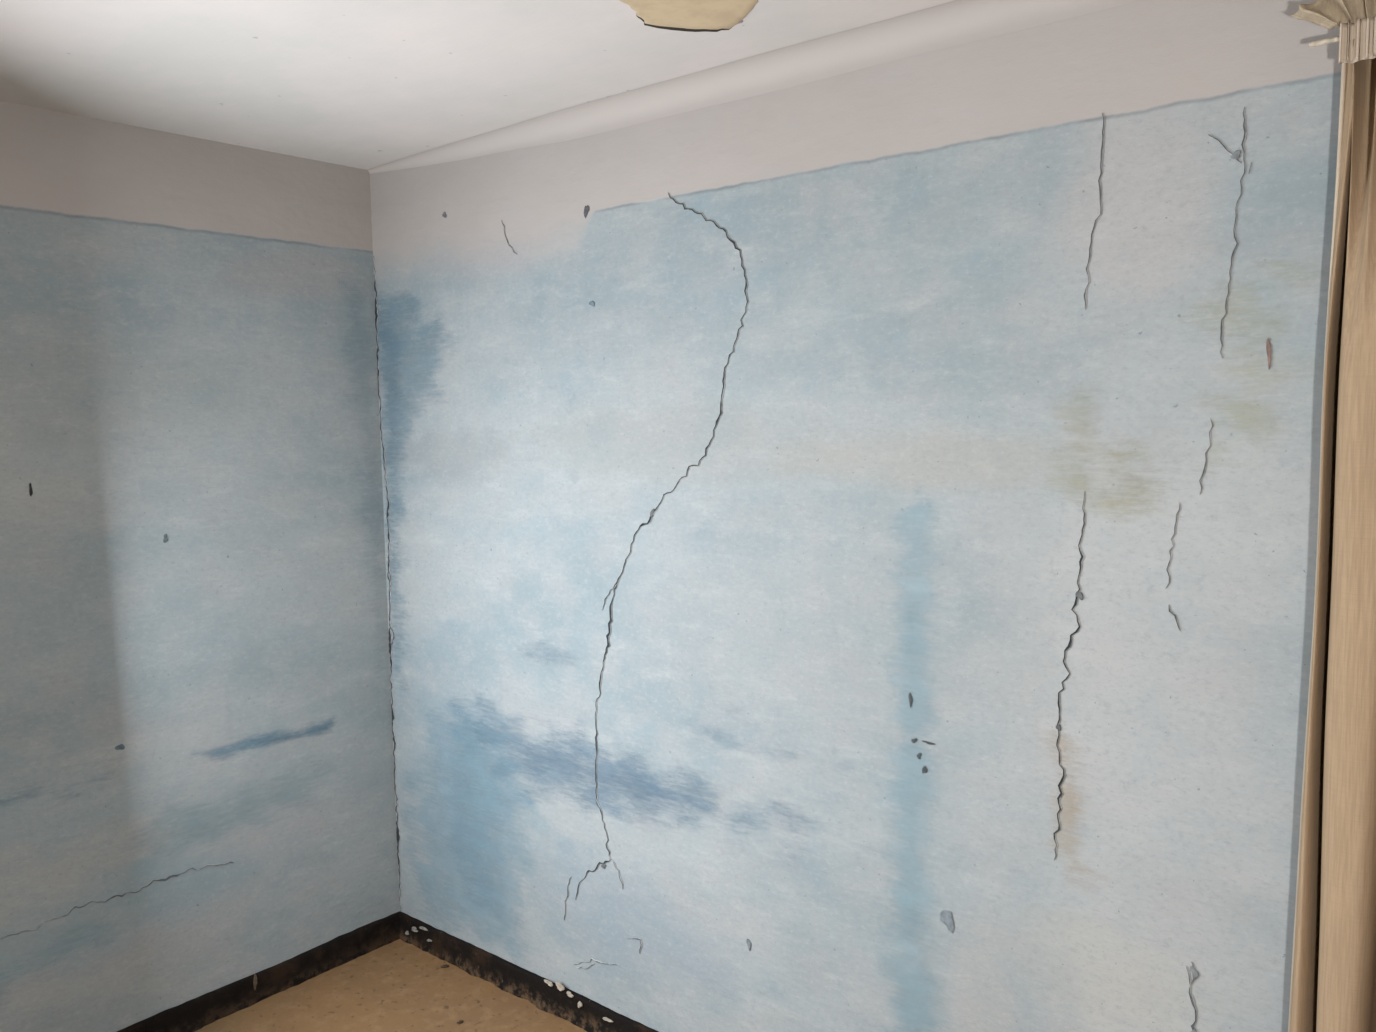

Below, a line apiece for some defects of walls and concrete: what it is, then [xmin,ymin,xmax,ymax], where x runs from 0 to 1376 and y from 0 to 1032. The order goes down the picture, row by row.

peeling [620,0,758,32]
crack [1083,113,1105,309]
crack [1208,107,1252,358]
crack [564,192,749,920]
crack [1165,418,1214,631]
crack [1053,492,1086,860]
crack [0,861,234,939]
crack [1186,962,1199,1032]